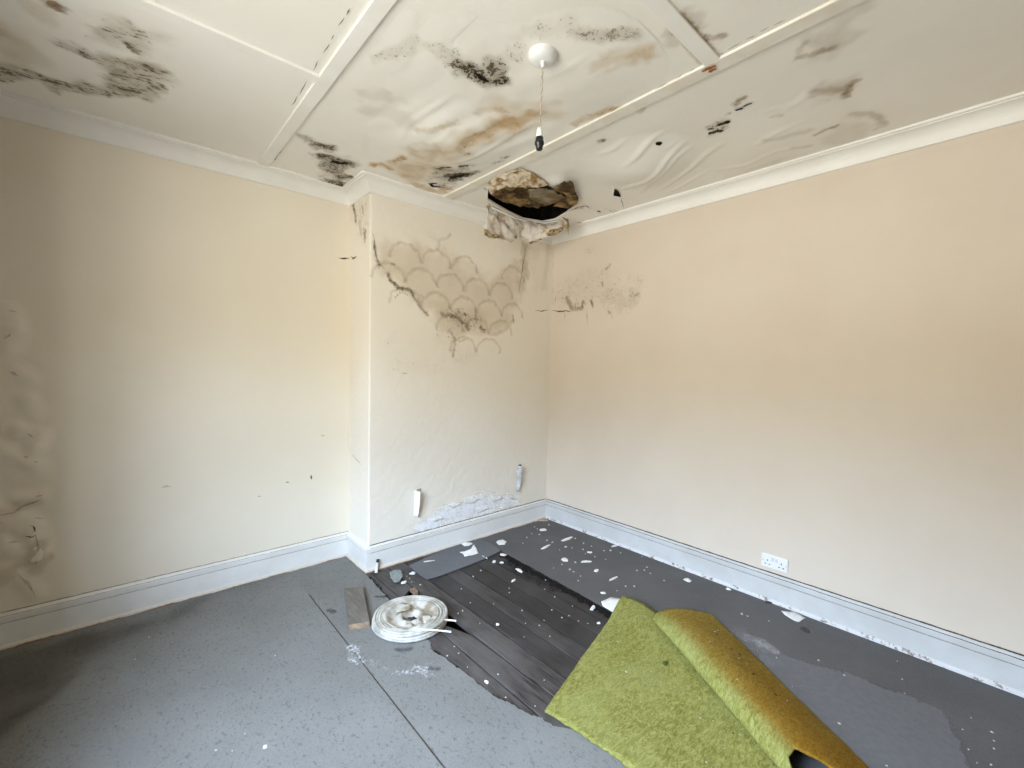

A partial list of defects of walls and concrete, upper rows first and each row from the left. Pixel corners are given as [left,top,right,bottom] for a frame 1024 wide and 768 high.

water stain [0,20,169,101]
water stain [445,47,520,88]
water stain [708,97,752,135]
water stain [297,135,356,186]
water stain [429,147,473,188]
peeling [414,464,522,532]